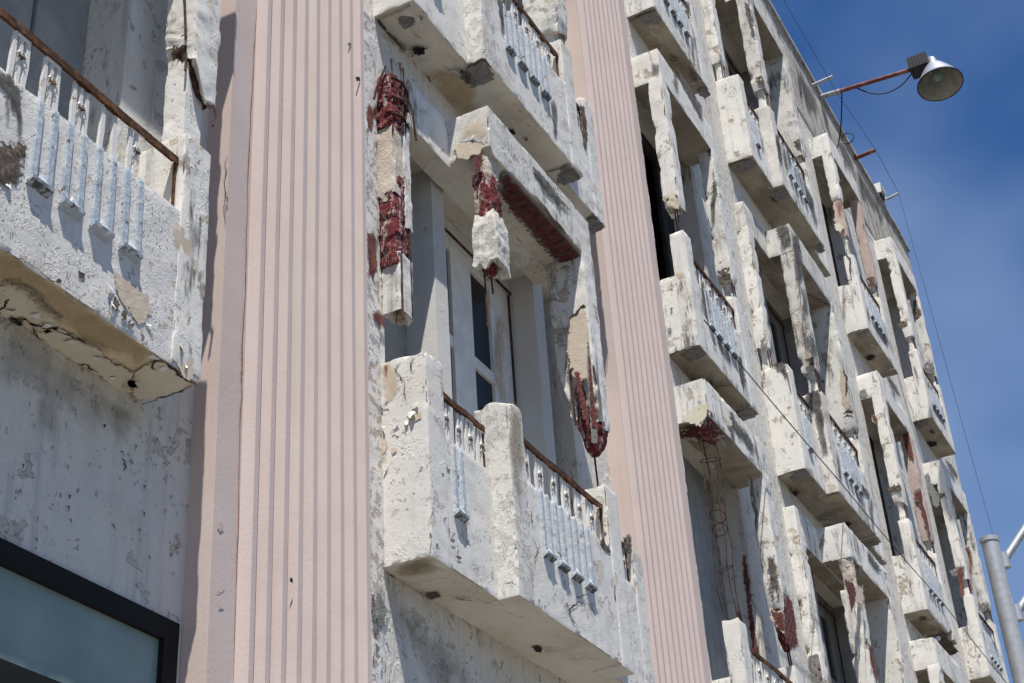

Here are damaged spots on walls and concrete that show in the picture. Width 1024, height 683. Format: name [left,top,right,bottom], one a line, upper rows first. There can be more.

spalling [459,59,495,88]
rust [366,104,379,132]
spalling [0,141,27,189]
spalling [498,171,581,263]
rust [367,233,378,280]
crack [15,319,99,374]
peeling [0,271,194,400]
crack [143,360,197,405]
rust [373,310,386,329]
peeling [566,304,598,444]
spalling [679,395,743,622]
spalling [769,586,799,666]